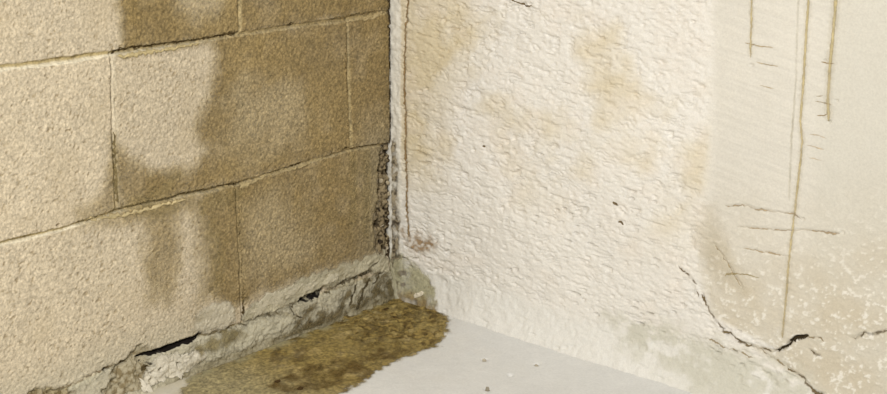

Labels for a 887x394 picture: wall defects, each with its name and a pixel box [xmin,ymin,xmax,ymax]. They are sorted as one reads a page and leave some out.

crack [111,31,233,54]
crack [112,132,237,208]
damp [118,0,391,304]
crack [266,0,410,318]
peeling [101,344,207,394]
crack [135,209,245,365]
damp [181,255,449,394]
crack [679,267,823,394]